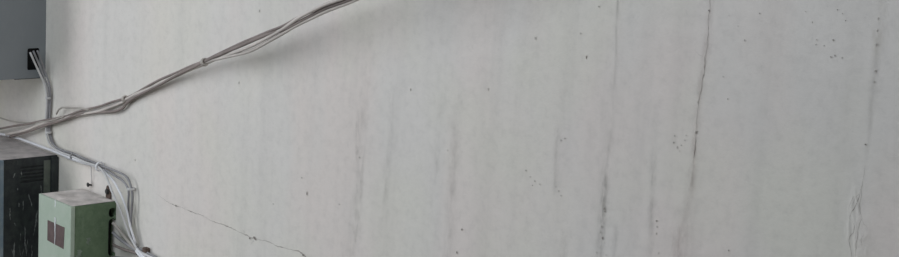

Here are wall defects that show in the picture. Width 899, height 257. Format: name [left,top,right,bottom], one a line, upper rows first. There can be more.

crack [161,197,306,257]